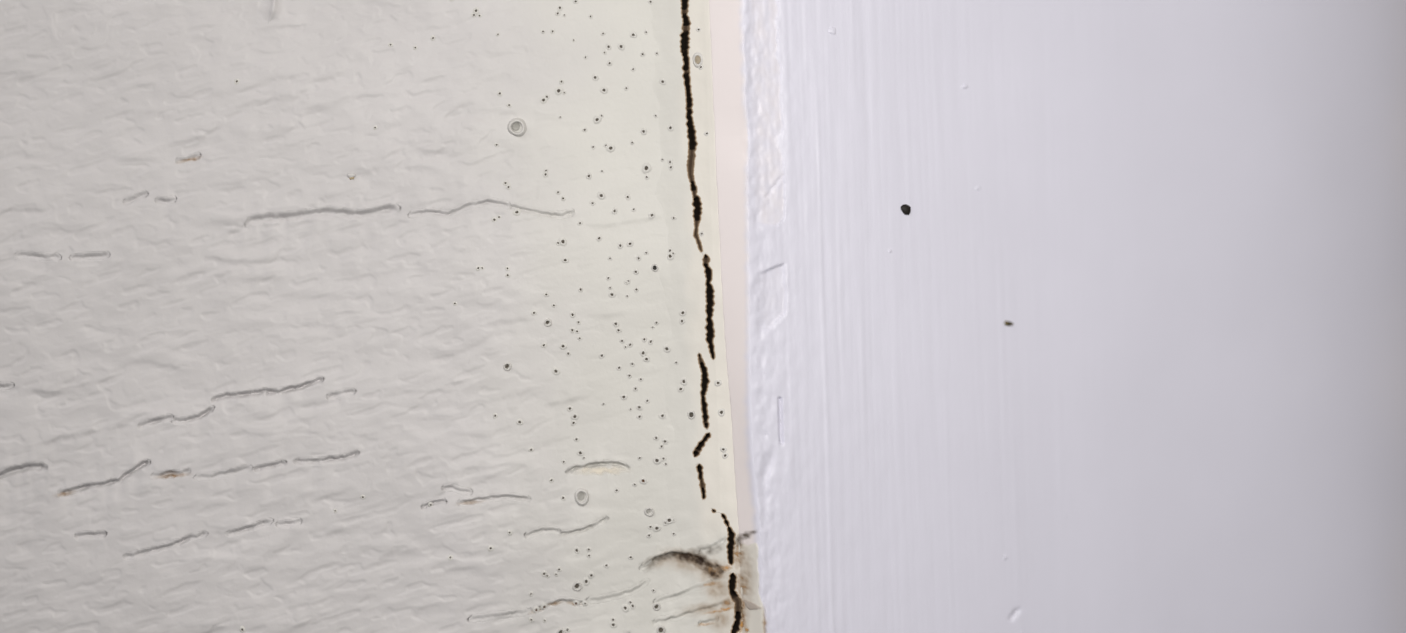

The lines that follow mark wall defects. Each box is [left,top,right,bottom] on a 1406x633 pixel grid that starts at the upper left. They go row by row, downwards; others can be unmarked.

crack [245,198,574,228]
crack [469,0,743,633]
crack [58,377,359,498]
crack [75,518,302,560]
crack [422,483,608,540]
rust [652,531,755,590]